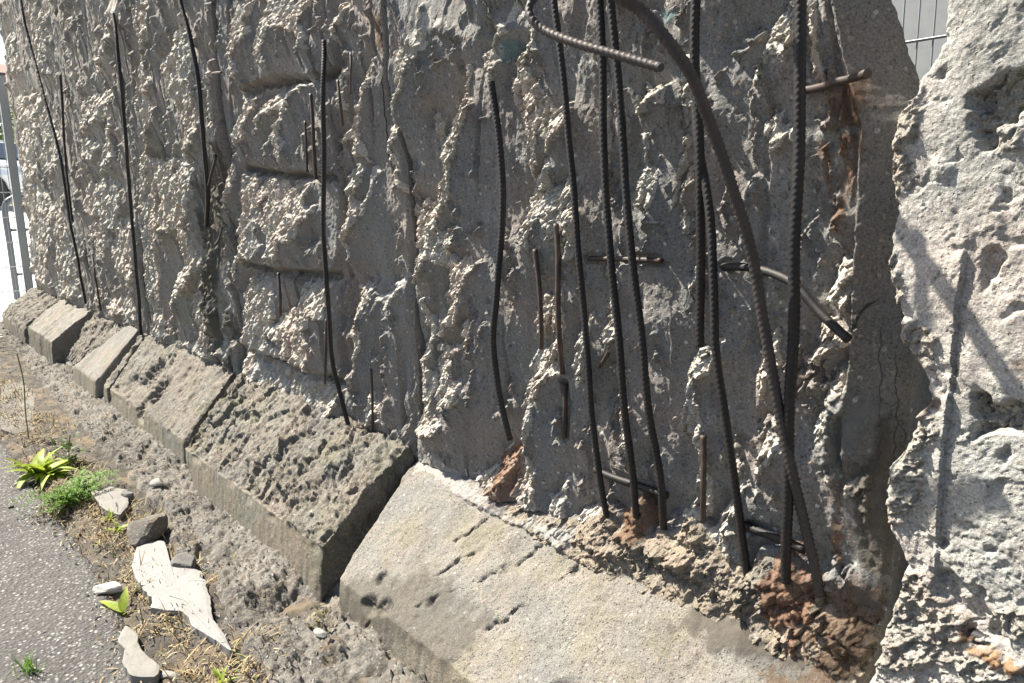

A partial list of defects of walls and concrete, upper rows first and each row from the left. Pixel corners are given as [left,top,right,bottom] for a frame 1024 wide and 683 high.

spalling [751,0,794,85]
spalling [807,0,826,82]
spalling [16,0,580,440]
spalling [592,35,614,169]
spalling [635,132,659,224]
spalling [635,73,692,115]
spalling [671,134,696,234]
spalling [764,109,793,151]
rust [821,81,863,188]
spalling [892,98,922,202]
spalling [412,250,1024,683]
rust [615,494,659,542]